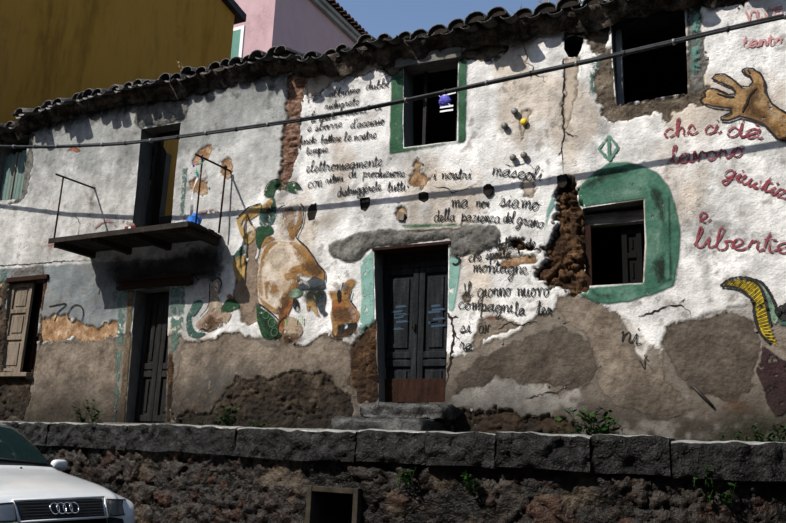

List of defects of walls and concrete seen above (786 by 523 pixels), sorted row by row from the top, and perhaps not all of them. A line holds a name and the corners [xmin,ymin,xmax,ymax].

crack [517,44,577,163]
flaking render [278,64,383,189]
peeling [193,145,212,165]
peeling [221,158,232,178]
peeling [190,178,210,197]
spalling [493,183,589,296]
peeling [39,313,118,343]